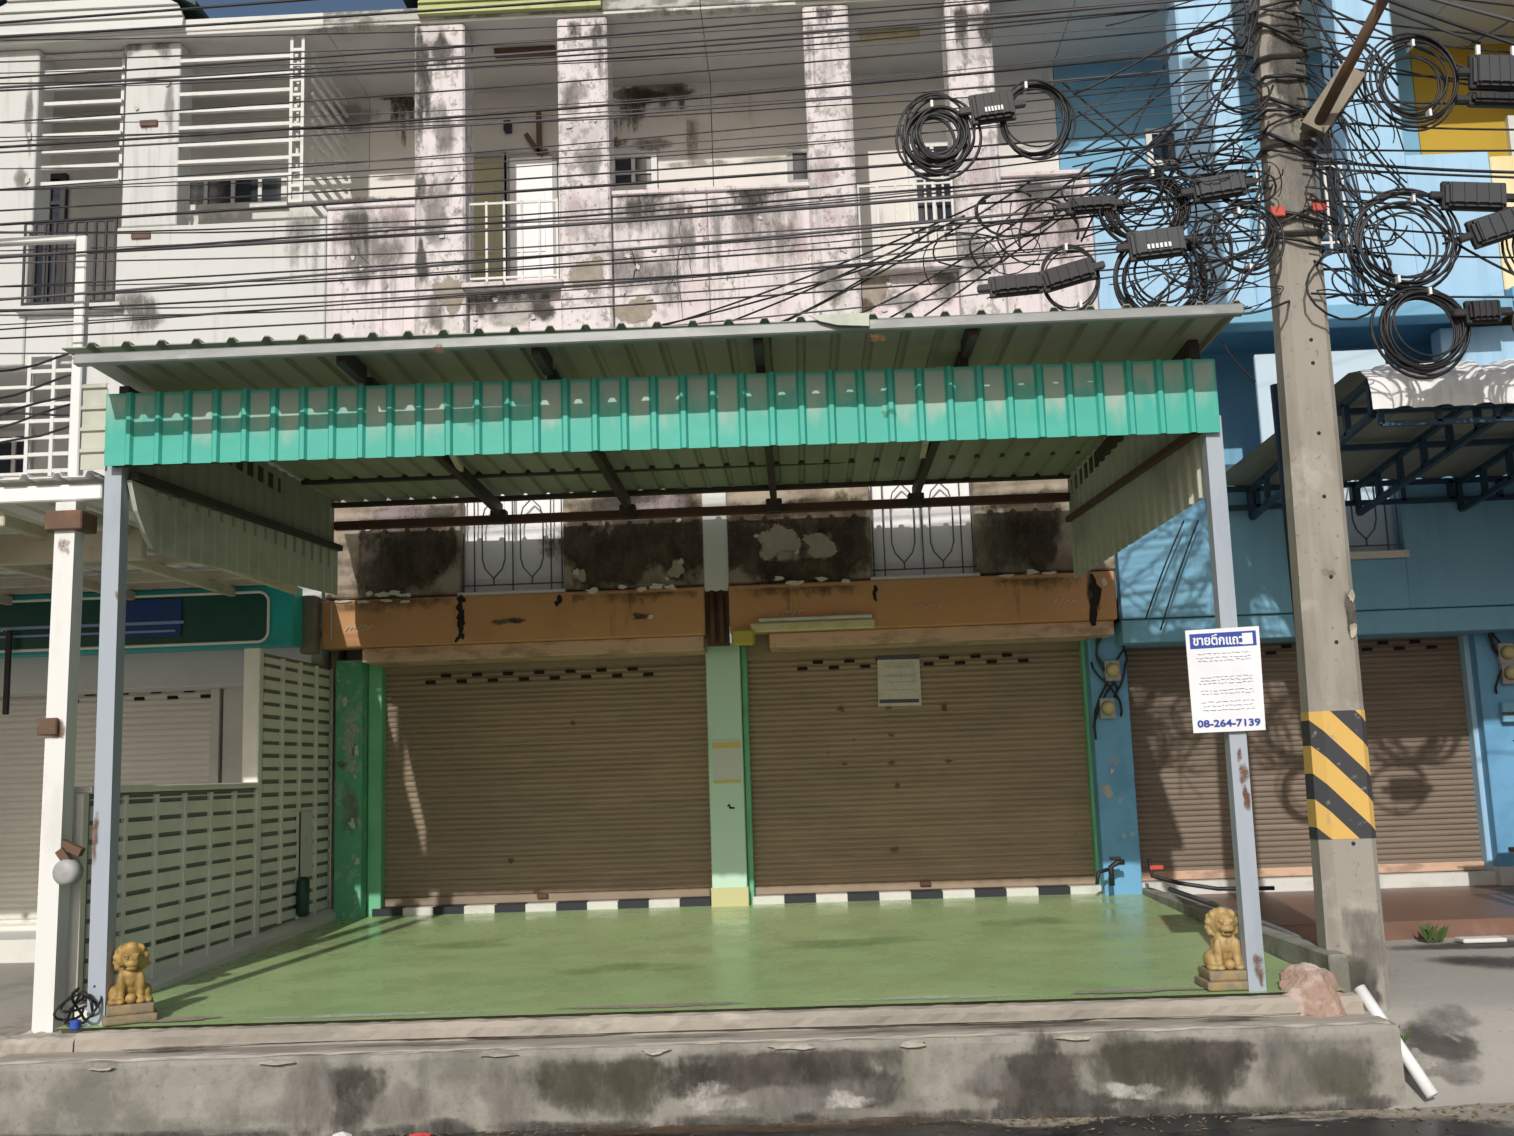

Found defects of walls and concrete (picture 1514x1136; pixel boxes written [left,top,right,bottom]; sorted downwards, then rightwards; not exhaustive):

damp [569,22,603,57]
damp [416,175,426,200]
damp [621,189,692,253]
damp [711,189,786,240]
damp [357,506,457,607]
damp [541,494,704,600]
damp [727,492,871,593]
spalling [754,523,851,586]
damp [988,493,1062,585]
damp [83,1128,285,1136]
damp [483,1049,900,1132]
damp [905,1022,1391,1120]